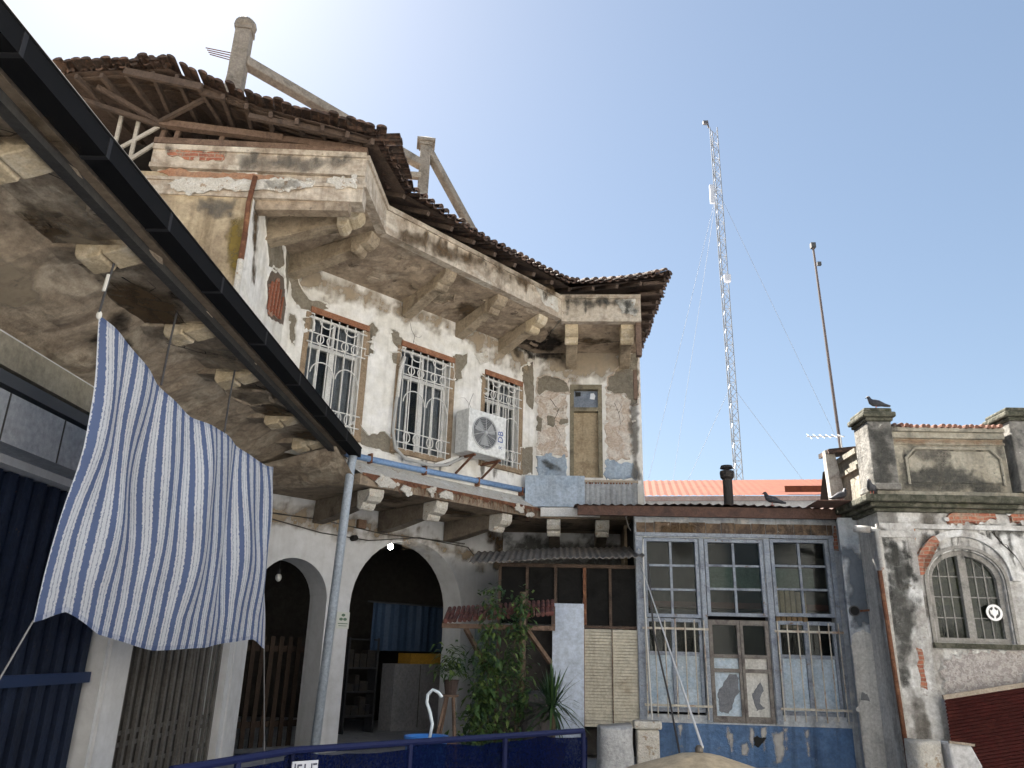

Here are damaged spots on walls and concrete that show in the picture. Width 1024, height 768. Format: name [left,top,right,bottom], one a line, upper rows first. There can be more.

peeling [157,149,358,196]
spalling [262,216,330,347]
peeling [519,360,571,477]
peeling [603,353,641,480]
water stain [868,424,1001,492]
flaking render [914,529,940,575]
flaking render [944,509,1024,528]
water stain [880,513,1024,685]
spalling [916,643,1024,694]
water stain [914,702,930,739]